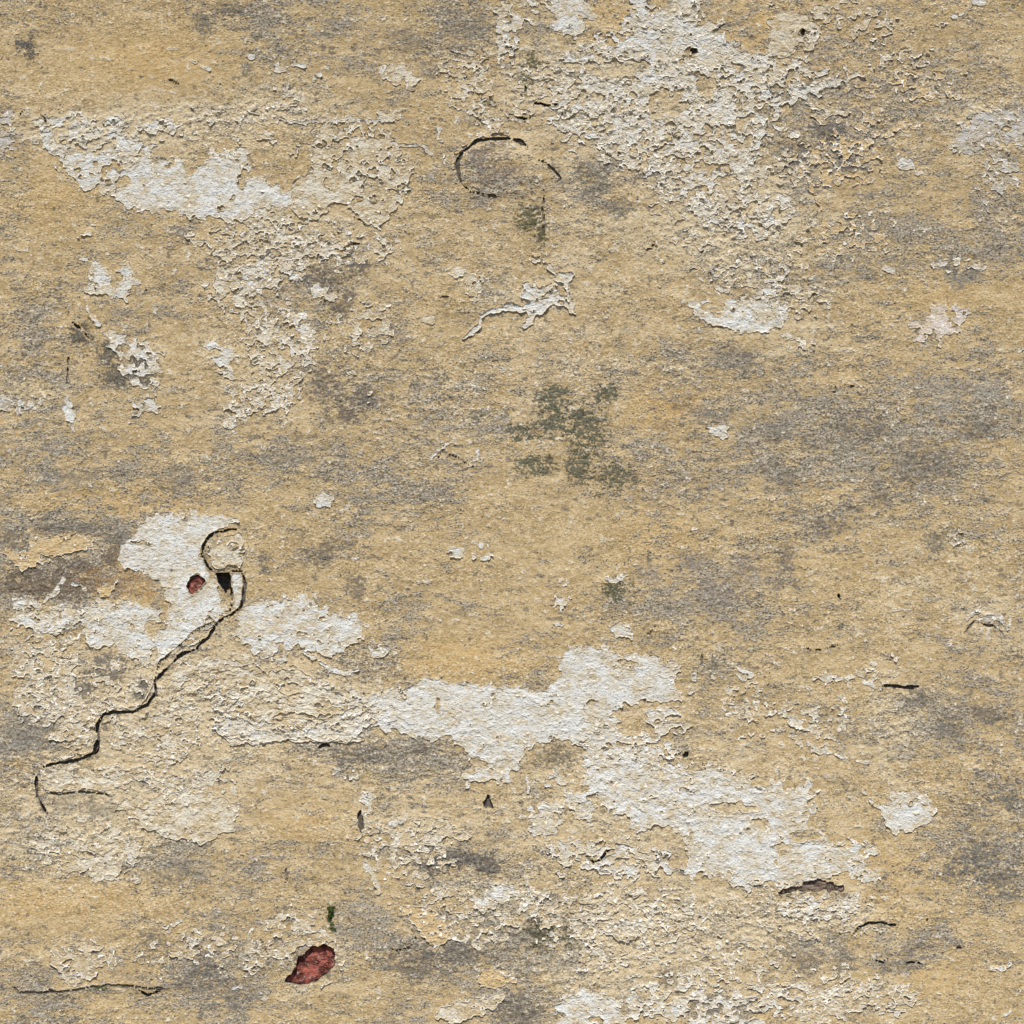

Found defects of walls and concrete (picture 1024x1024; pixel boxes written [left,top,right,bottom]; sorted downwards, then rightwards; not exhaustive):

peeling [32,0,971,429]
crack [455,86,562,233]
peeling [930,257,987,274]
damp [505,382,637,497]
crack [34,528,247,814]
peeling [0,509,919,1024]
peeling [862,790,938,836]
crack [12,983,163,996]